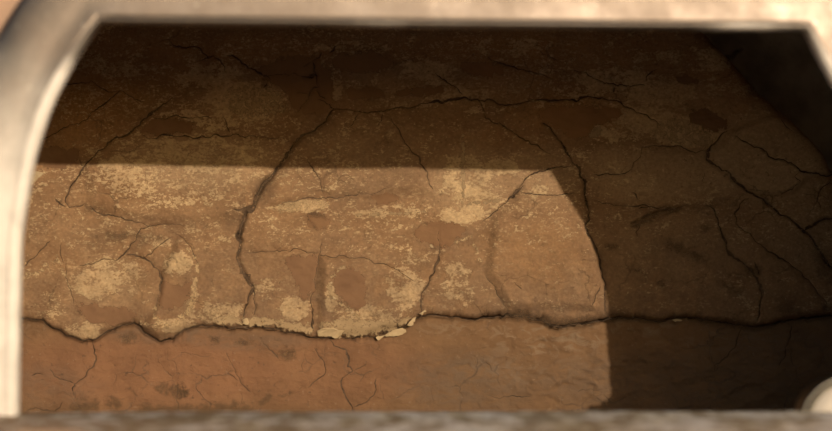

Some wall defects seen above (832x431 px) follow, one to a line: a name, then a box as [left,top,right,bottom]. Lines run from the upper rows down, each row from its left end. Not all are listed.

crack [23,40,658,411]
peeling [376,310,426,340]
crack [416,123,832,371]